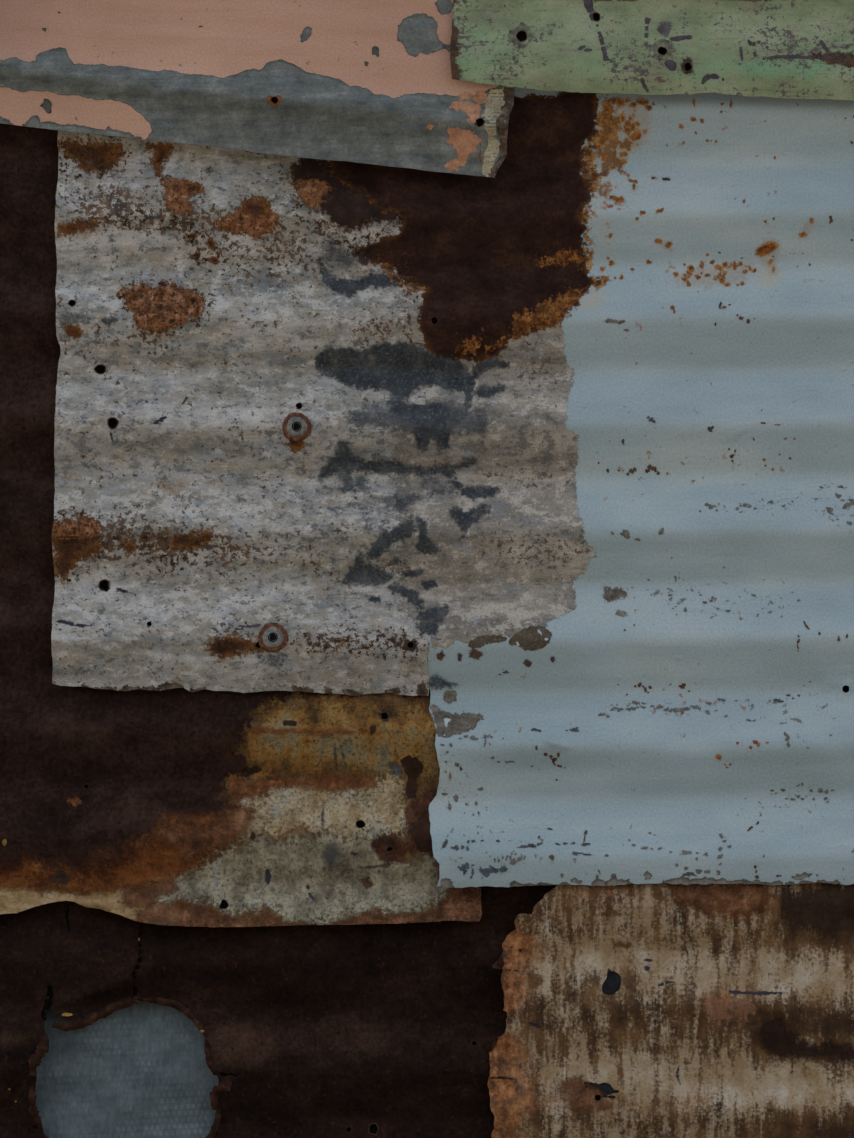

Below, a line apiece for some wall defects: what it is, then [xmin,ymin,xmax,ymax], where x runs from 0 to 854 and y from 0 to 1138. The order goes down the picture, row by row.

peeling [397,0,452,57]
peeling [657,22,692,71]
peeling [810,51,854,68]
peeling [0,47,515,178]
corrosion [57,91,655,373]
corrosion [673,241,811,287]
corrosion [52,500,216,590]
peeling [602,586,627,617]
peeling [598,682,738,718]
corrosion [0,690,482,927]
corrosion [668,883,854,938]
corrosion [705,997,854,1065]